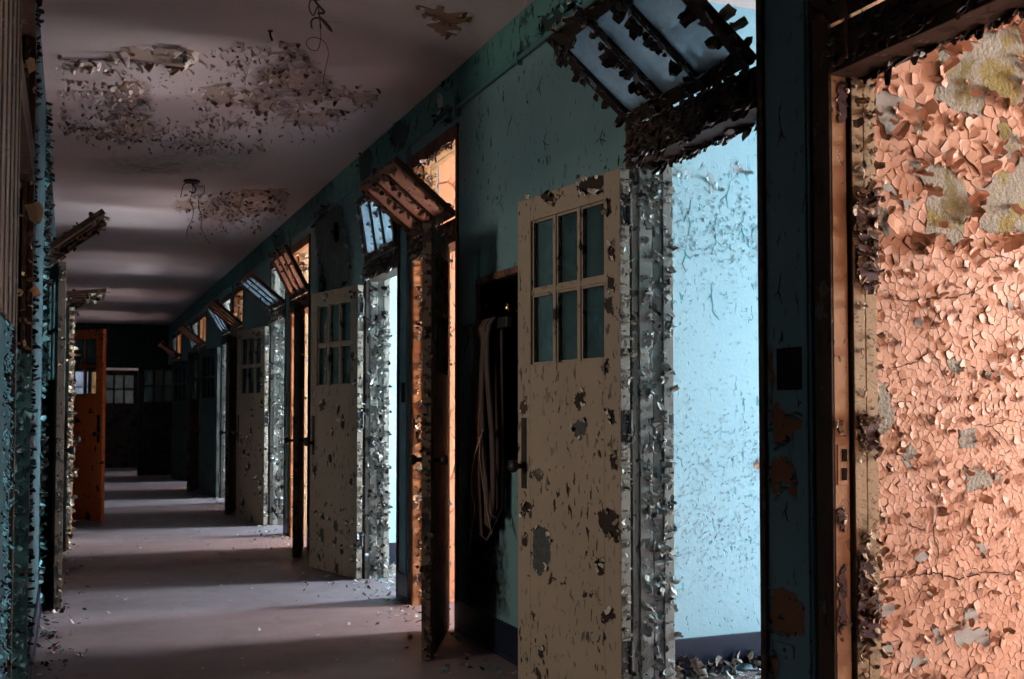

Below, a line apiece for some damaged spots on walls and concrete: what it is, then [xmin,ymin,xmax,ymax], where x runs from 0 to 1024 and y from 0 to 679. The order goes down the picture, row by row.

spalling [416,5,473,40]
flaking render [826,0,1024,310]
spalling [0,0,381,679]
peeling [170,118,517,679]
peeling [534,0,805,679]
flaking render [836,332,918,474]
flaking render [913,316,933,330]
flaking render [946,357,965,375]
flaking render [958,427,978,449]
flaking render [963,466,1001,501]
peeling [837,511,901,679]
flaking render [930,608,999,651]